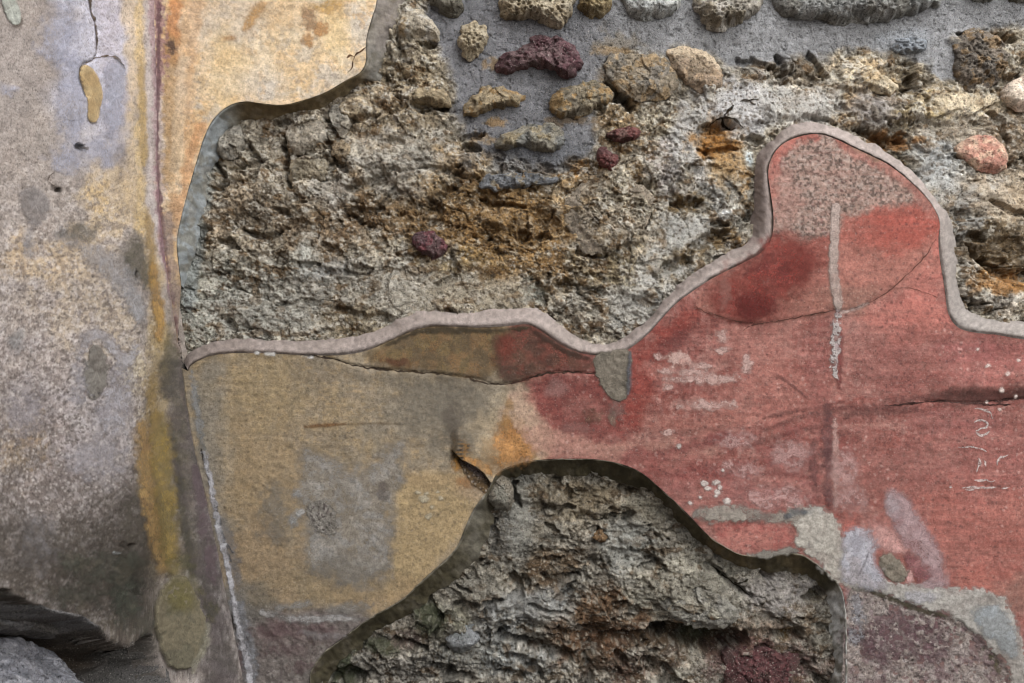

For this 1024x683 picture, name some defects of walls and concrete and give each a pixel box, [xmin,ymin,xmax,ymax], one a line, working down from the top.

crack [64,0,125,121]
flaking render [177,0,1024,370]
damp [711,234,812,322]
crack [694,239,936,331]
peeling [654,352,753,390]
peeling [676,399,736,410]
crack [887,398,1024,406]
peeling [774,443,806,466]
flaking render [289,490,338,535]
flaking render [309,453,1011,683]